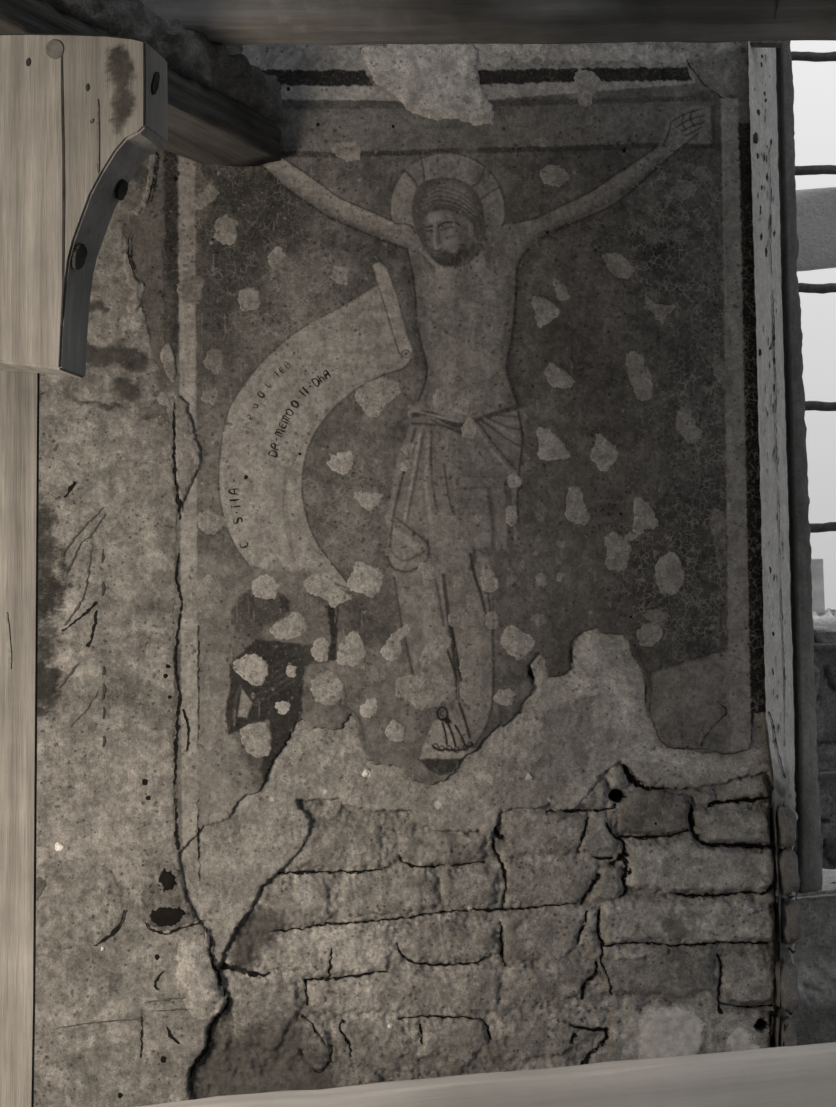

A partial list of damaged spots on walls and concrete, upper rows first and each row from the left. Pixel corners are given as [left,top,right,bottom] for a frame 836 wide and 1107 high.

flaking render [213,214,239,245]
flaking render [327,451,354,475]
flaking render [536,427,571,461]
flaking render [604,497,658,572]
leakage [37,494,67,716]
flaking render [252,574,279,599]
flaking render [303,561,383,608]
crack [265,148,797,1073]
flaking render [655,552,684,595]
crack [173,553,200,881]
flaking render [140,609,802,1100]
crack [221,963,270,977]